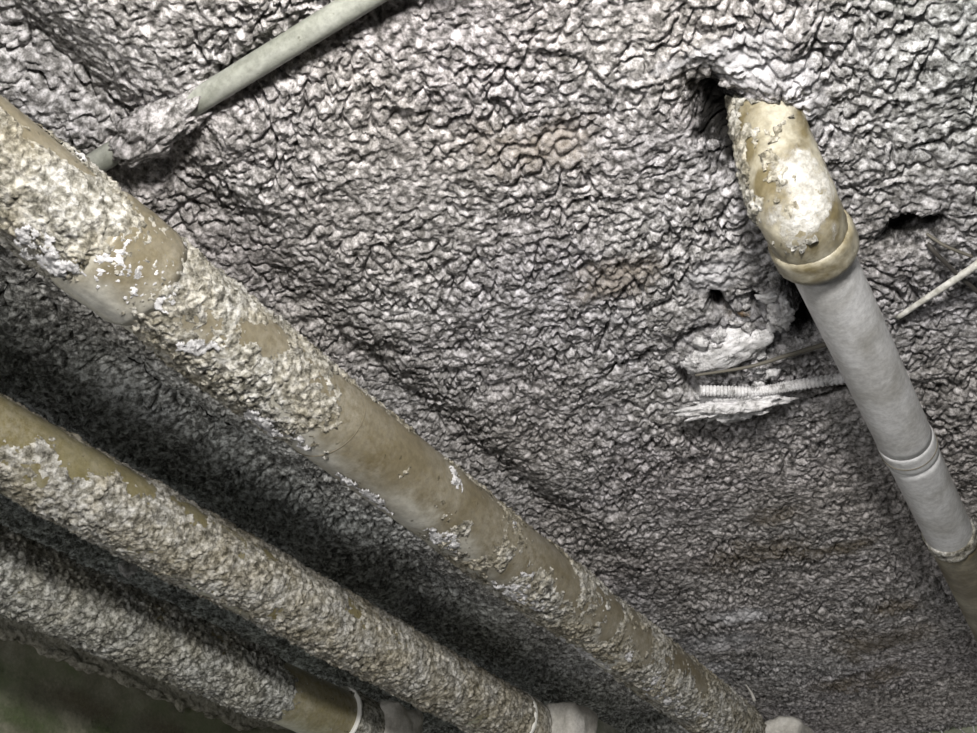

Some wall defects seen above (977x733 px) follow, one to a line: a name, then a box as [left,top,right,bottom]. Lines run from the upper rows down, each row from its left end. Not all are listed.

spalling [672,65,743,181]
spalling [660,275,819,387]